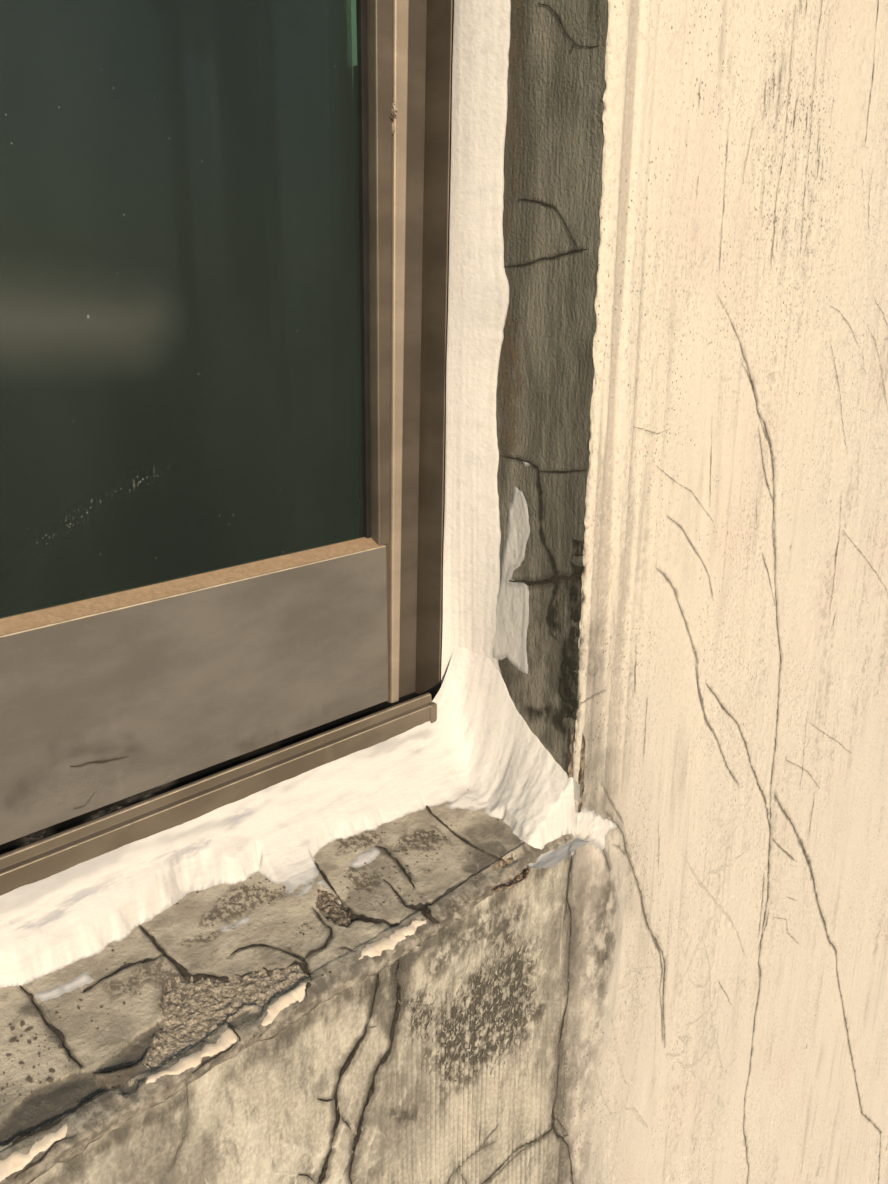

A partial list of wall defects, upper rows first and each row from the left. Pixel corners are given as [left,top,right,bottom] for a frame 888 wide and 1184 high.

peeling [493,487,530,674]
water stain [528,539,586,733]
crack [661,294,888,1184]
flaking render [0,1115,68,1182]
crack [19,985,136,1074]
water stain [97,1124,130,1153]
spalling [139,965,311,1085]
crack [83,846,467,996]
water stain [275,1012,311,1049]
crack [299,960,403,1184]
spalling [296,833,446,935]
water stain [337,890,544,1083]